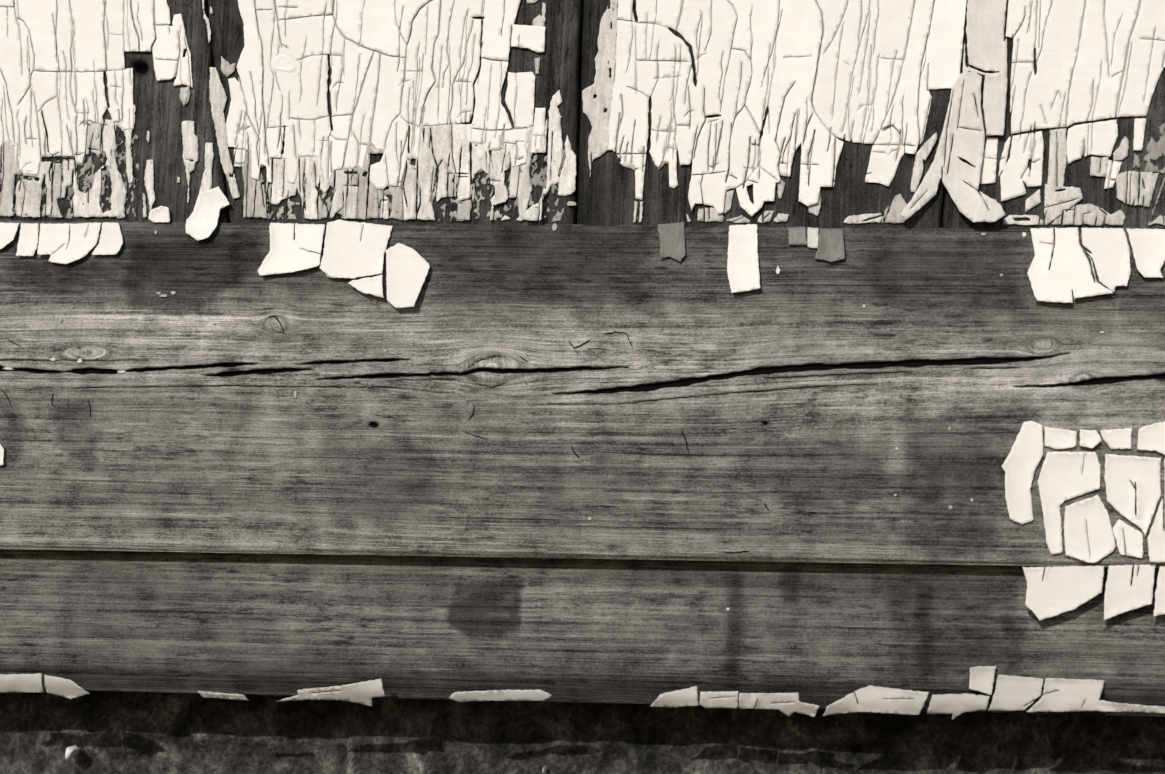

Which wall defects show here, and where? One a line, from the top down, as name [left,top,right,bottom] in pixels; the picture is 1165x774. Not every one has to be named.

peeling [0,0,194,264]
peeling [176,0,1165,308]
crack [0,331,1165,439]
peeling [1001,421,1165,620]
peeling [0,673,90,699]
peeling [198,691,249,701]
peeling [279,678,385,706]
peeling [449,689,551,702]
peeling [650,666,1165,720]